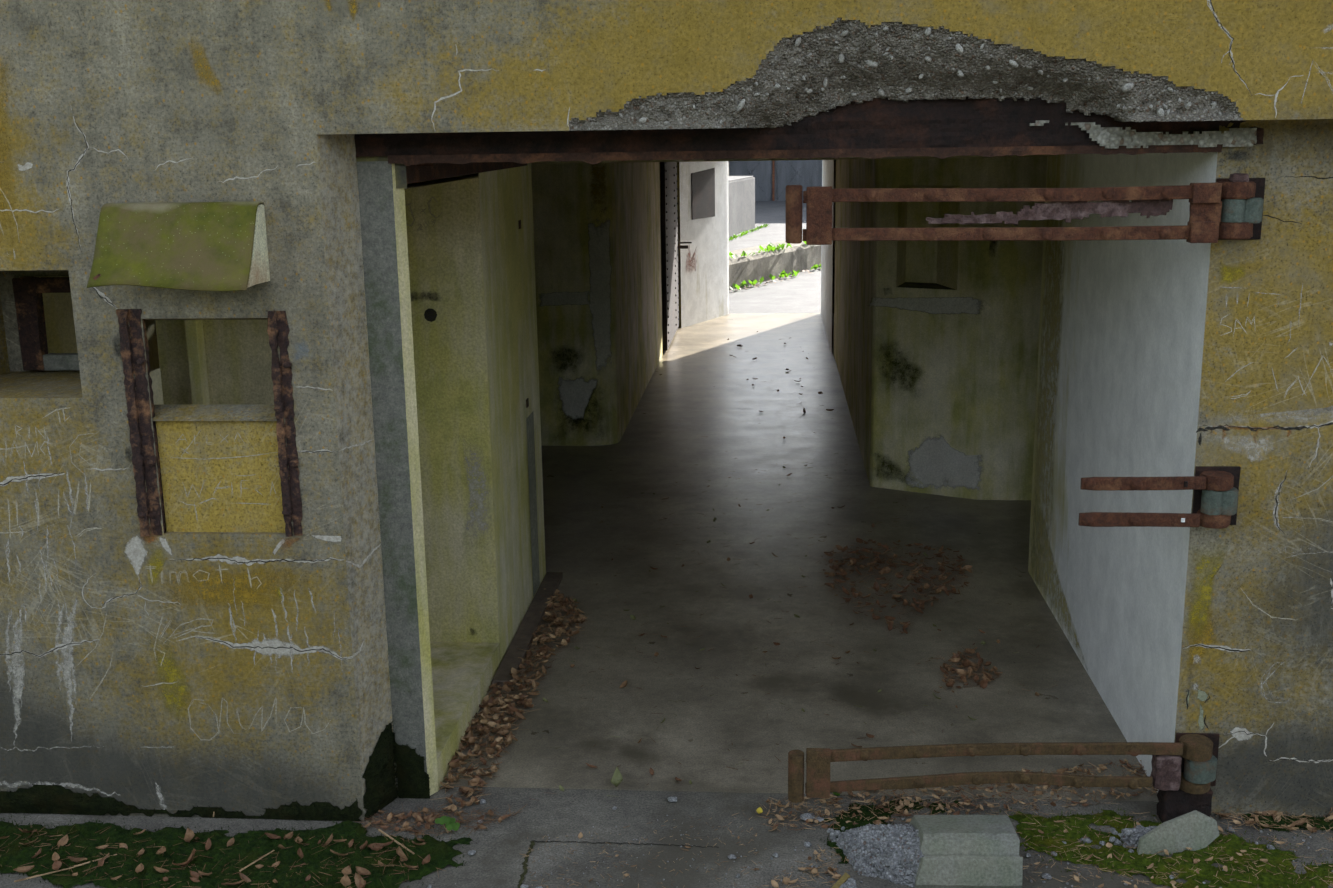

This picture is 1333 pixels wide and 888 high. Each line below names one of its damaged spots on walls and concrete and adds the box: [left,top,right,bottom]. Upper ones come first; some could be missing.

spalling [569,18,1243,131]
crack [0,109,191,254]
crack [221,162,317,183]
rust [926,199,1173,225]
crack [92,287,118,309]
flaking render [559,377,597,419]
crack [1202,421,1333,533]
crack [171,543,381,568]
crack [0,573,180,658]
crack [196,637,364,660]
crack [1219,723,1333,763]